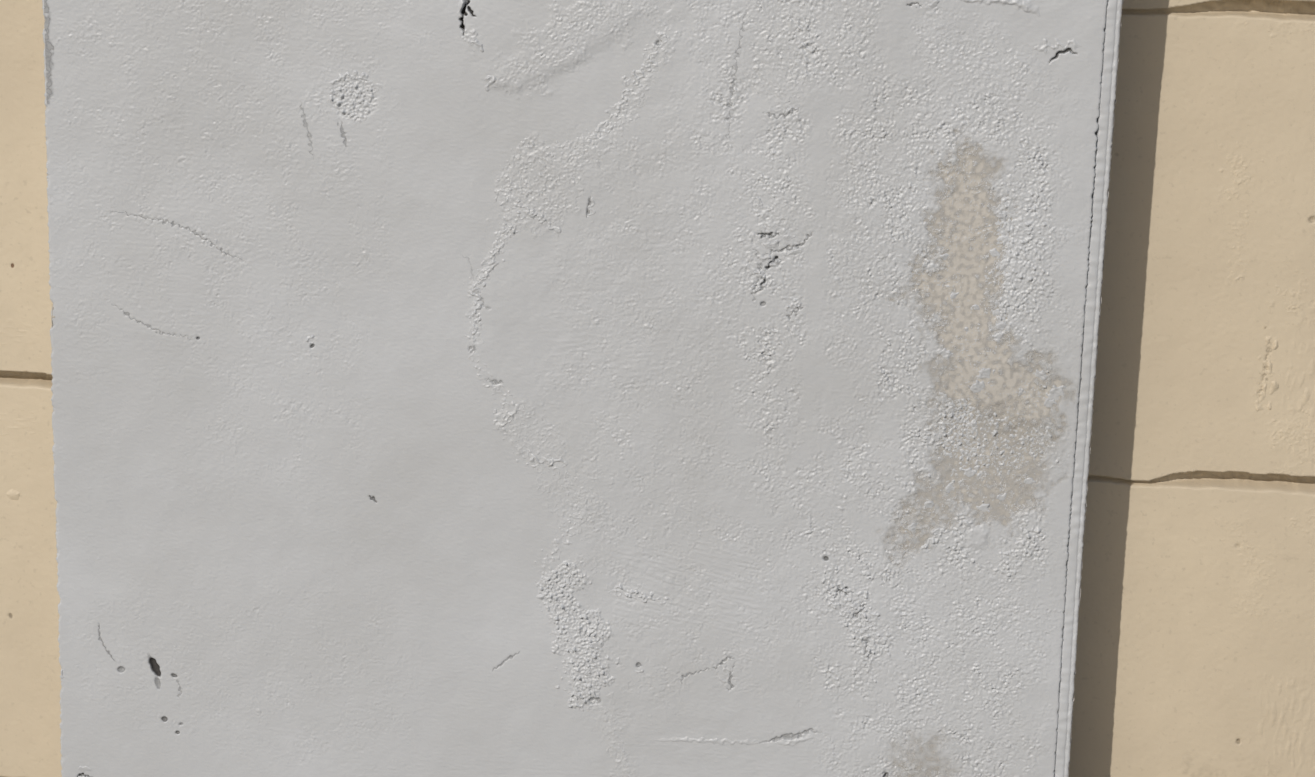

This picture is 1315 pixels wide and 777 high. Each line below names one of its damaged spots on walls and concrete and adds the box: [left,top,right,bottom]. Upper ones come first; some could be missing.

crack [457,0,478,47]
peeling [744,0,884,124]
peeling [751,119,1075,731]